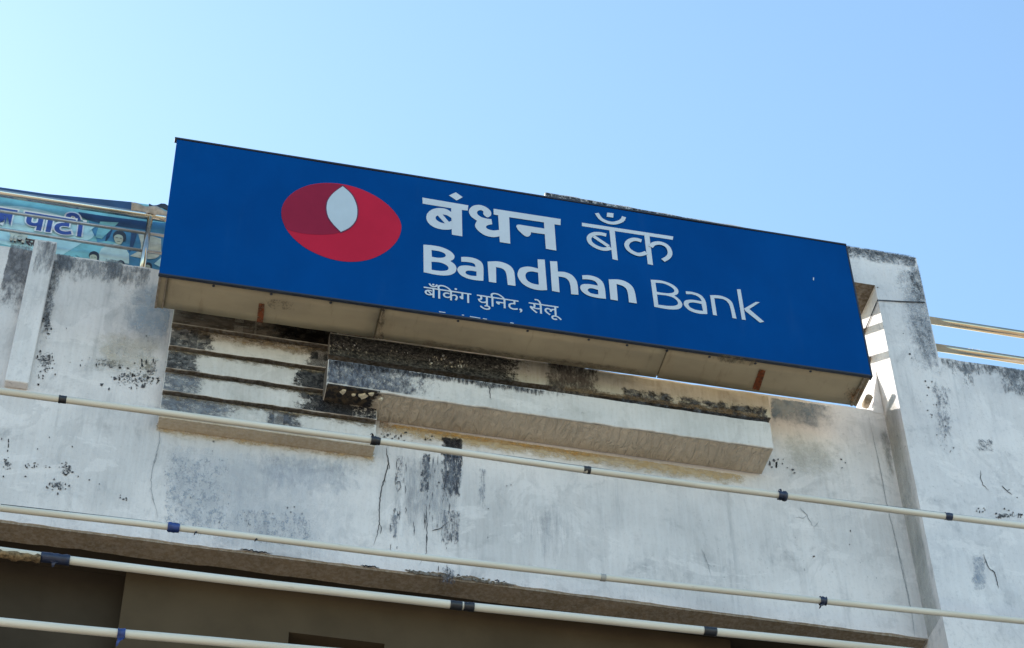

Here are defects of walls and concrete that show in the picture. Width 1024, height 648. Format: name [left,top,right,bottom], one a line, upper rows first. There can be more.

water stain [1,242,234,416]
spalling [340,389,383,401]
water stain [267,325,825,427]
crack [150,433,160,517]
crack [373,448,401,546]
water stain [390,437,462,550]
corrosion [380,421,742,481]